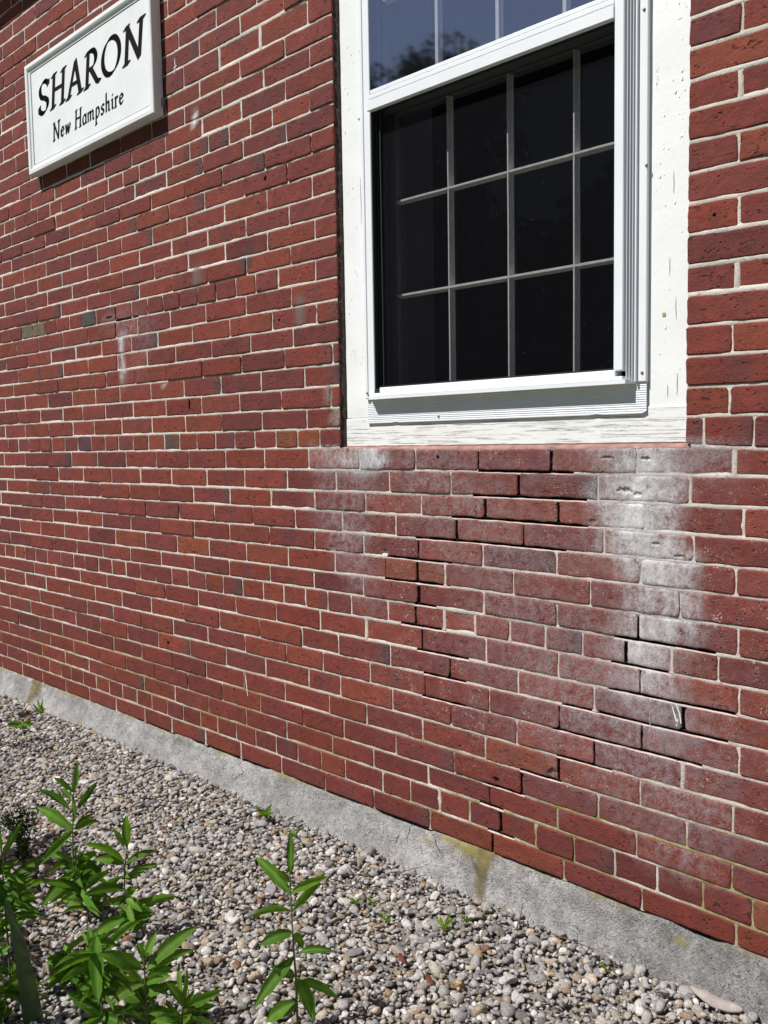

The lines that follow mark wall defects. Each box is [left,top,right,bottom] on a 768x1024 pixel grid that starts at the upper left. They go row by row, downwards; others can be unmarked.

damp [334,445,388,472]
damp [596,447,698,726]
crack [481,623,736,852]
damp [475,848,496,898]